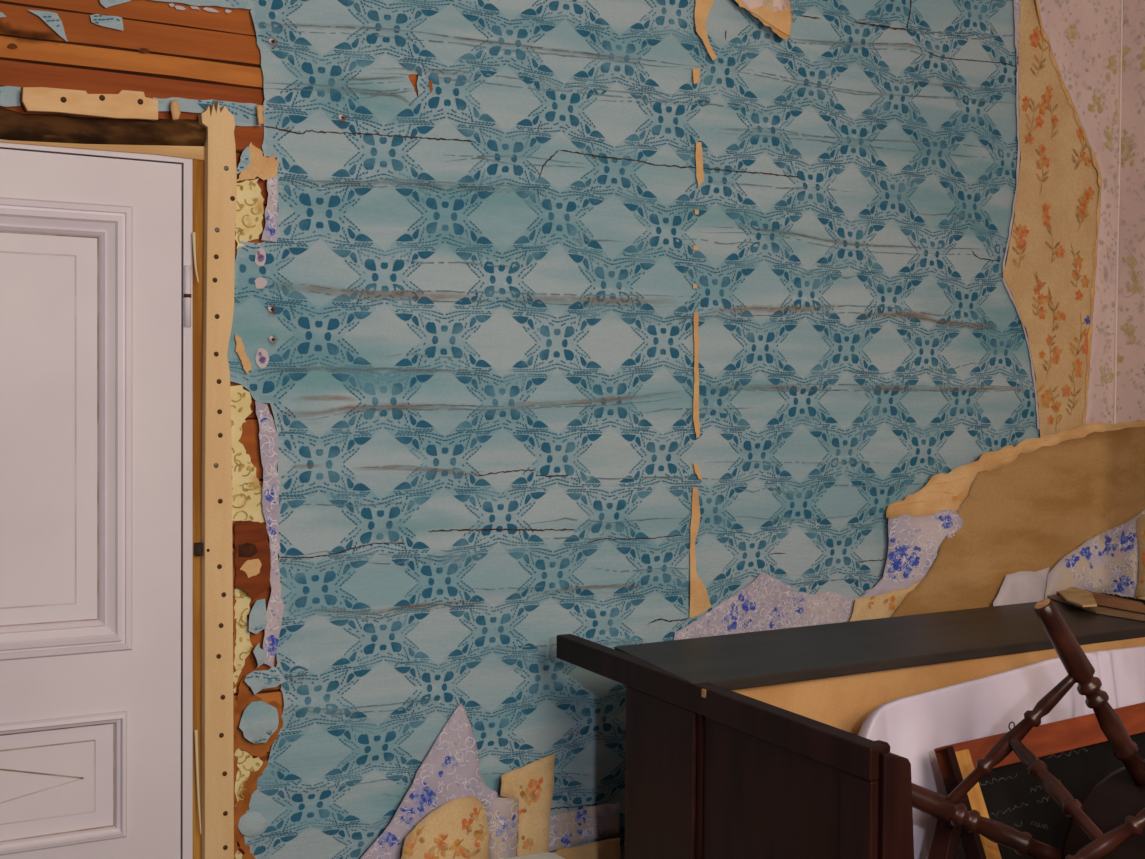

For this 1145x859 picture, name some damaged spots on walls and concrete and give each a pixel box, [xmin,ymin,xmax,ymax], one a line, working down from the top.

crack [265,126,474,142]
crack [539,150,799,178]
peeling [240,559,262,578]